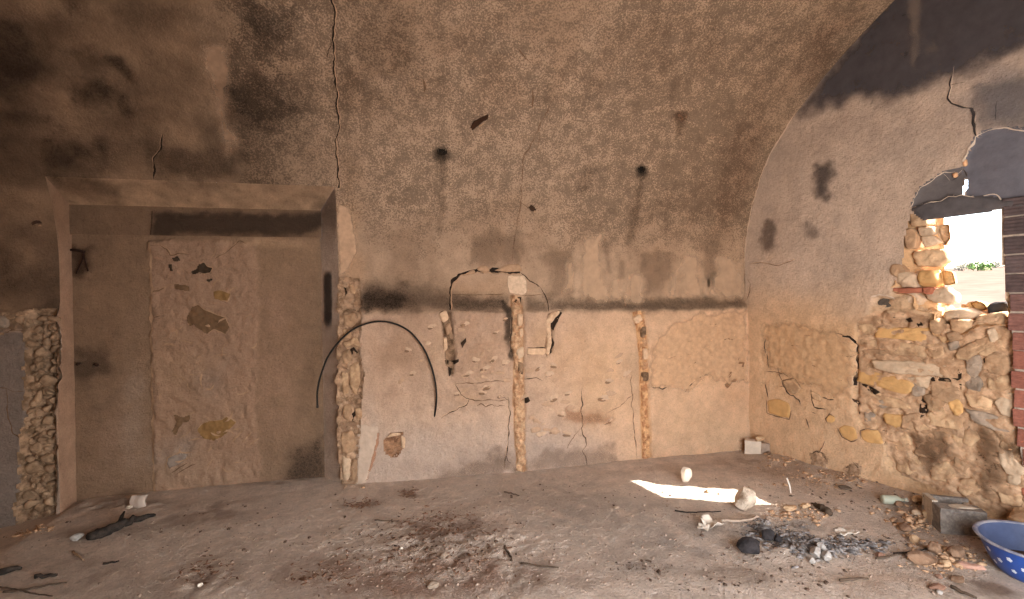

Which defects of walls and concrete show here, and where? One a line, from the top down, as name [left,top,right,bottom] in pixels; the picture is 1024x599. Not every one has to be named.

crack [326,0,341,188]
crack [947,68,997,137]
crack [152,133,163,179]
flaking render [910,126,1024,207]
peeling [187,262,231,334]
spalling [871,294,894,307]
peeling [172,415,237,441]
spalling [335,276,405,485]
crack [441,380,511,467]
crack [567,388,588,465]
flaking render [766,378,801,420]
flaking render [825,413,887,445]